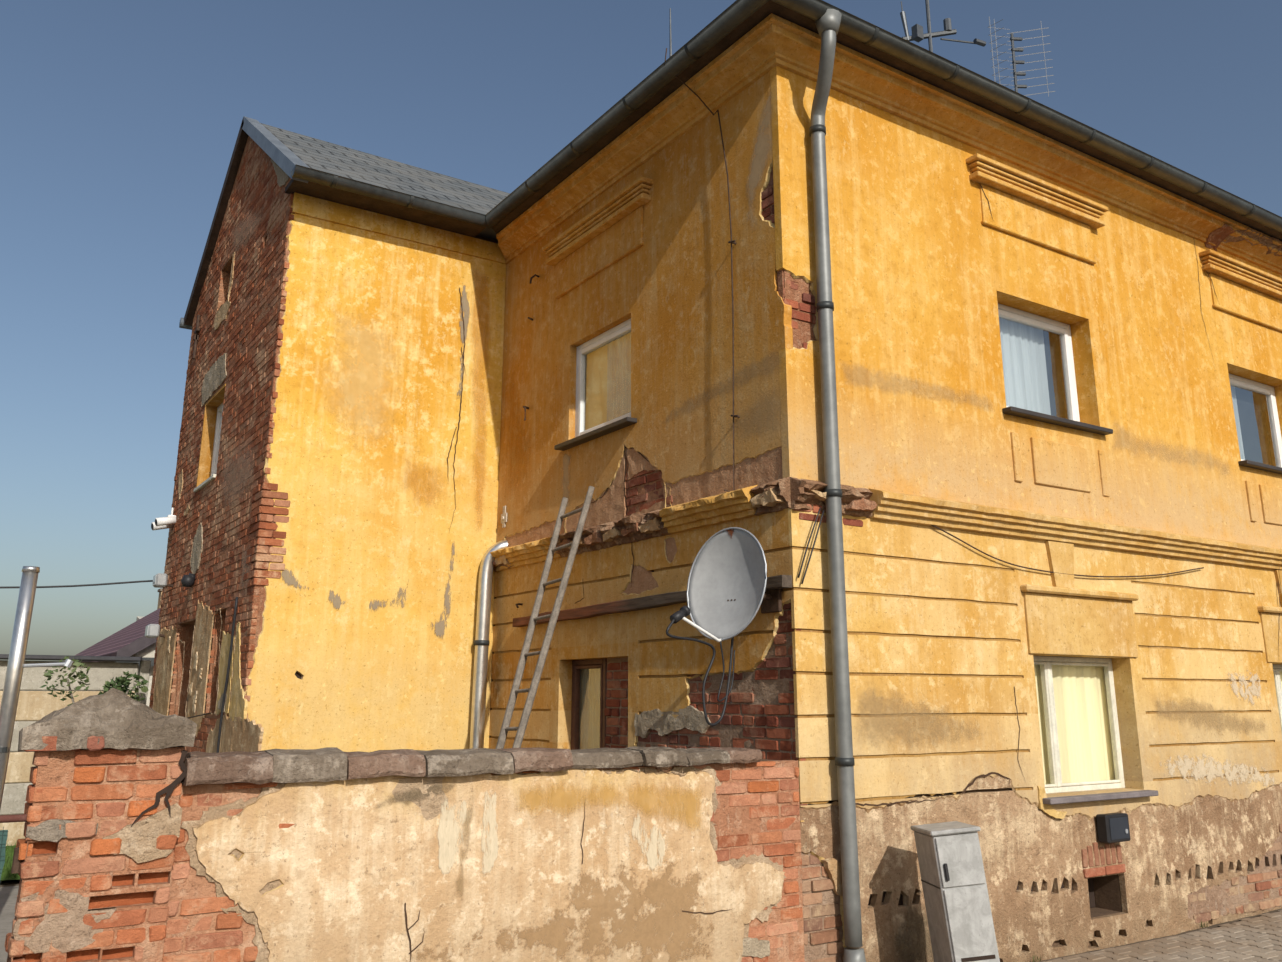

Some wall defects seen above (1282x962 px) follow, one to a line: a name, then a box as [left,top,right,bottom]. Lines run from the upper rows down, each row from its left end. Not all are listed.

spalling [759,160,775,228]
spalling [776,269,819,350]
crack [447,288,466,527]
spalling [493,444,827,567]
peeling [189,652,203,712]
spalling [622,599,806,761]
crack [131,750,188,826]
spalling [88,871,169,909]
spalling [800,774,1282,962]
spalling [66,946,133,962]